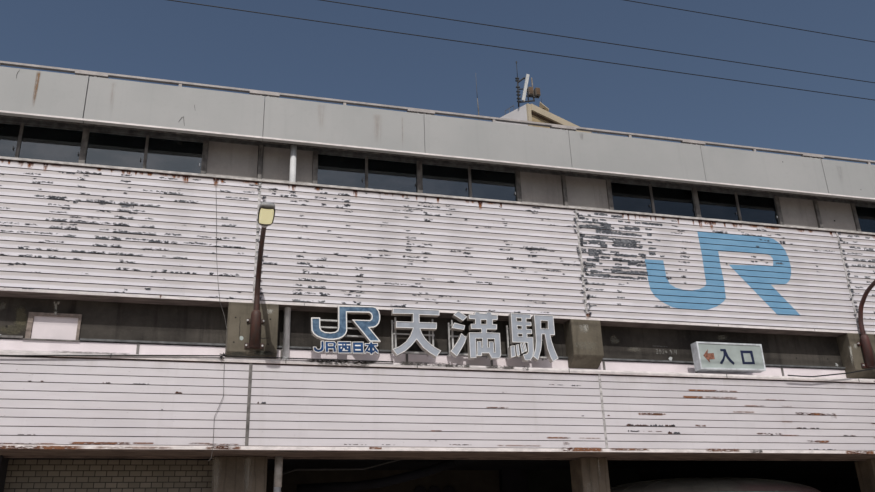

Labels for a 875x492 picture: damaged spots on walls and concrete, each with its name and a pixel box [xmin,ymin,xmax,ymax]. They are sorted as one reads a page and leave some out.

peeling [0,170,245,290]
peeling [220,181,353,239]
peeling [292,255,338,303]
peeling [392,198,454,221]
peeling [497,211,690,316]
peeling [813,232,875,328]